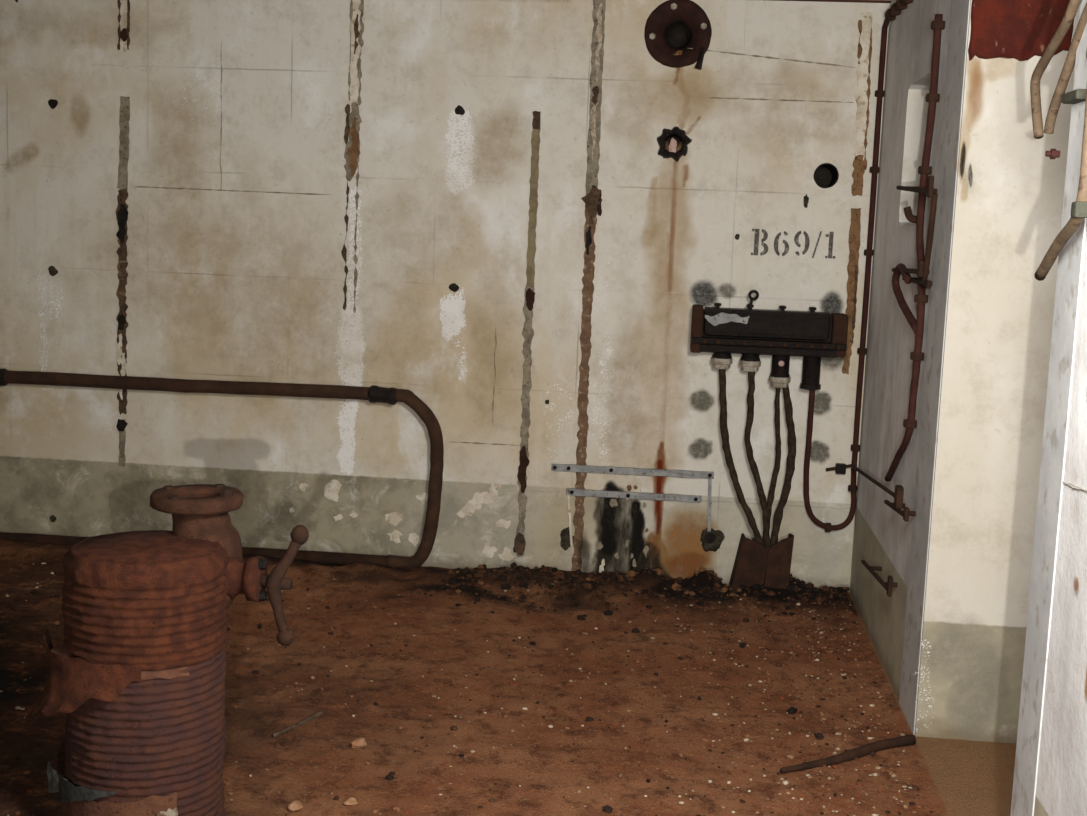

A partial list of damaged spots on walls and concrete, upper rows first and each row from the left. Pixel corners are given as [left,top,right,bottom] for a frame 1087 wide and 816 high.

leakage [443,109,478,196]
leakage [334,186,367,476]
leakage [438,284,468,383]
corrosion [646,443,673,578]